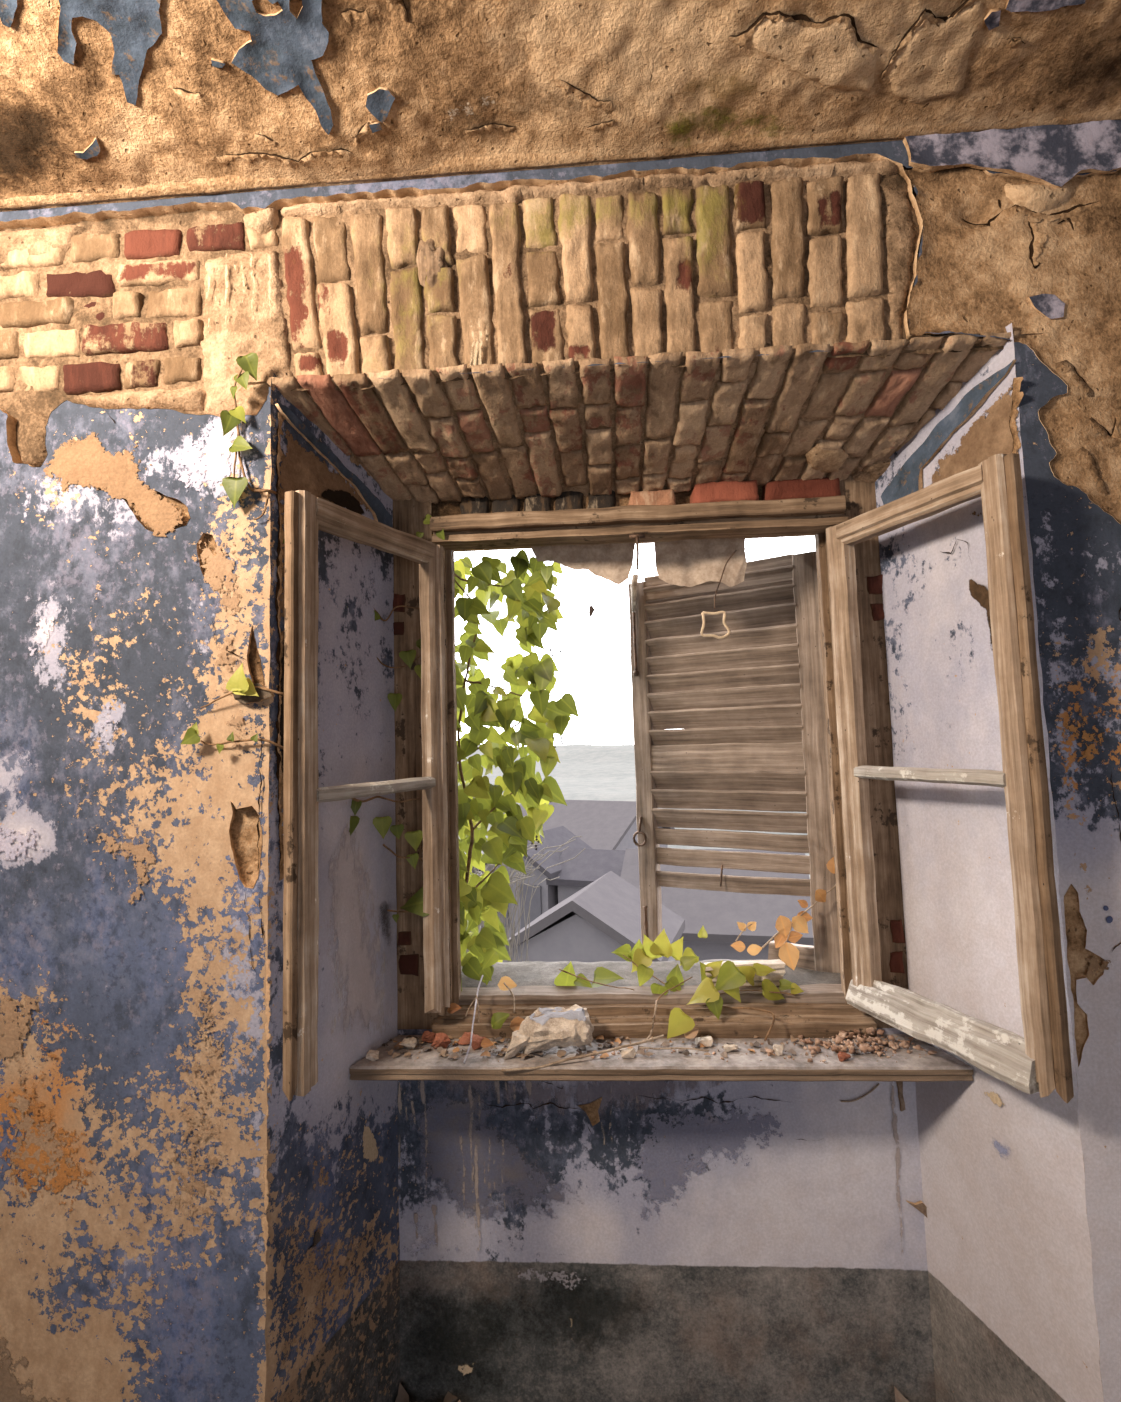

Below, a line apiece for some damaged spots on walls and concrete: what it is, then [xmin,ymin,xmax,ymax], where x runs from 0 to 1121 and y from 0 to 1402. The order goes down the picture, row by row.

peeling [57,0,163,105]
peeling [211,0,333,135]
crack [728,0,976,78]
crack [1008,37,1026,49]
crack [962,199,1102,269]
flaking render [0,120,1121,695]
crack [1009,360,1121,496]
flaking render [229,801,262,888]
water stain [398,1080,428,1154]
water stain [448,1080,698,1250]
water stain [891,1086,903,1252]
water stain [515,1268,640,1351]